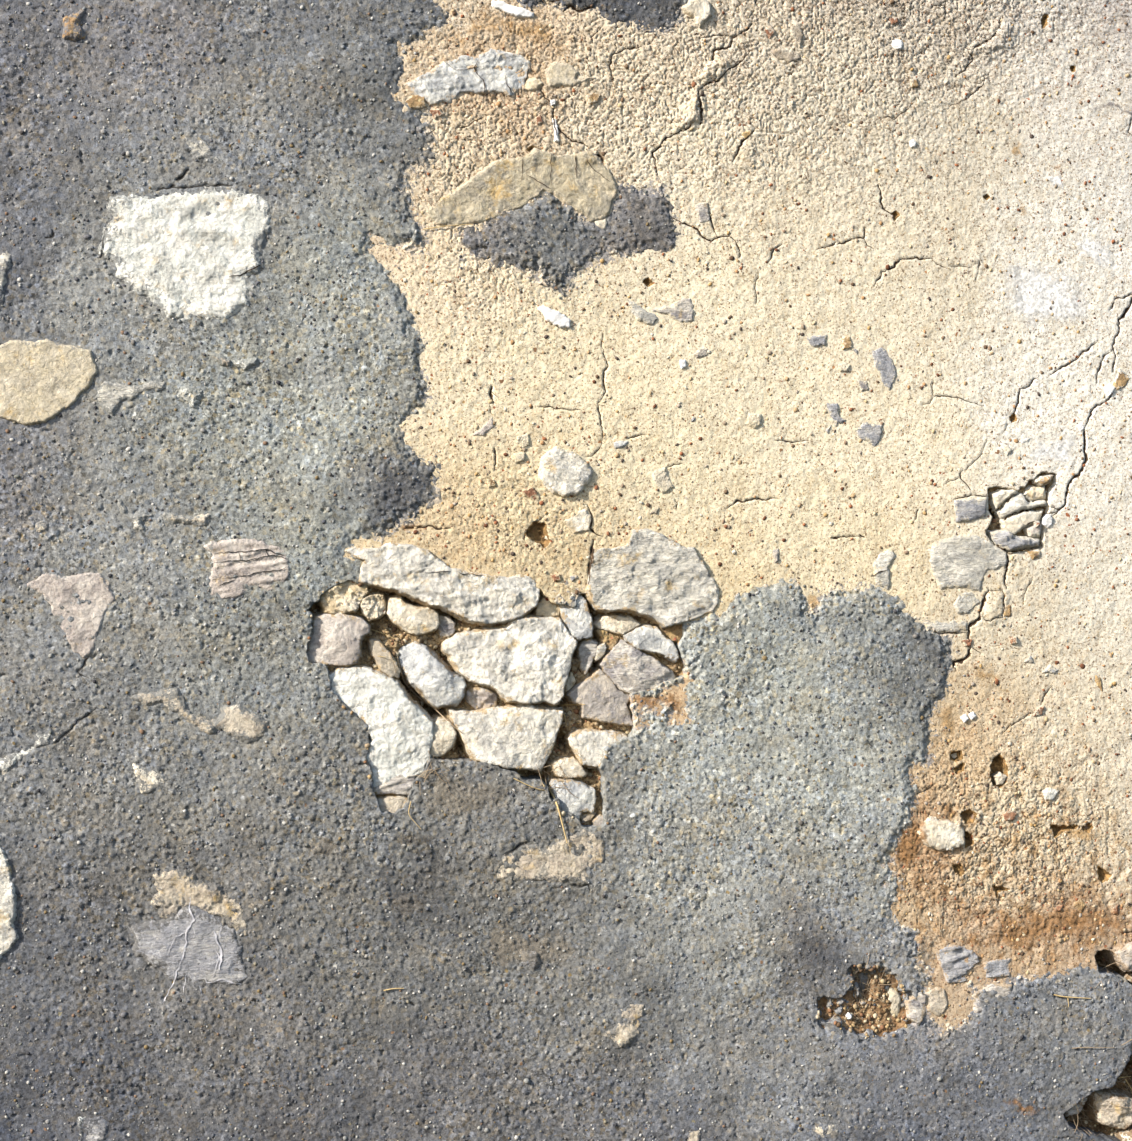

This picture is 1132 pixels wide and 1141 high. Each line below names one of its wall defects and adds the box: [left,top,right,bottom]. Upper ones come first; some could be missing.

crack [652,0,757,175]
crack [816,180,980,286]
spalling [524,521,550,548]
spalling [1011,472,1054,552]
crack [935,294,1132,671]
spalling [582,594,659,628]
spalling [350,609,519,717]
spalling [517,698,631,825]
spalling [990,754,1008,788]
spalling [960,809,977,848]
spalling [1050,822,1094,838]
spalling [817,968,912,1037]